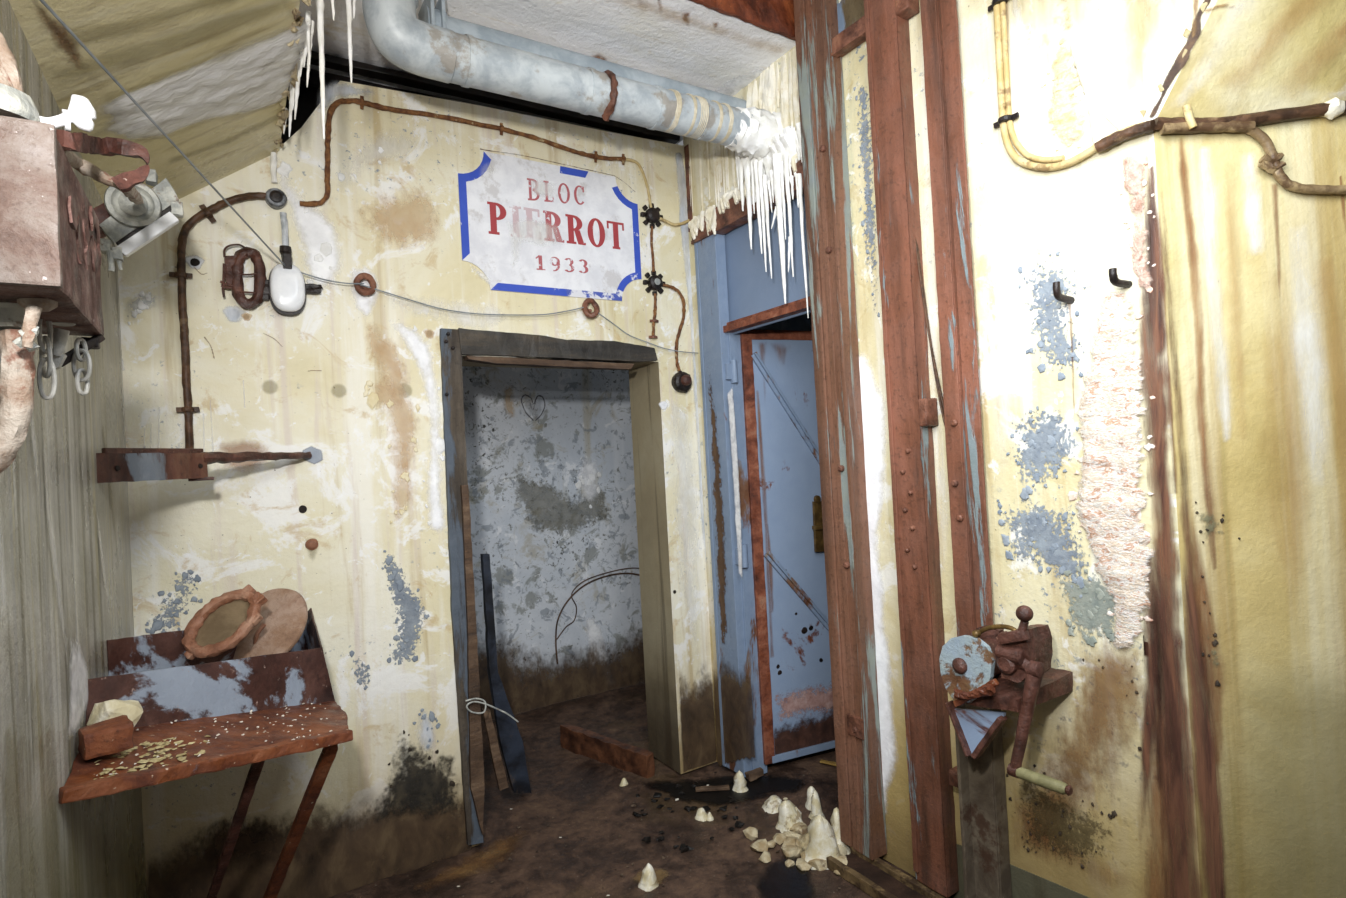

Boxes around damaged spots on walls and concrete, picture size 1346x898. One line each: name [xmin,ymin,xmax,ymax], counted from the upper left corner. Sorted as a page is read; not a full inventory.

spalling [1041,8,1085,151]
peeling [853,85,880,317]
spalling [1119,155,1156,293]
corrosion [708,374,727,643]
spalling [997,251,1155,649]
corrosion [1140,148,1225,898]
peeling [145,570,203,634]
peeling [349,650,370,690]
peeling [381,550,429,665]
water stain [478,618,645,723]
corrosion [774,686,835,755]
water stain [147,730,472,898]